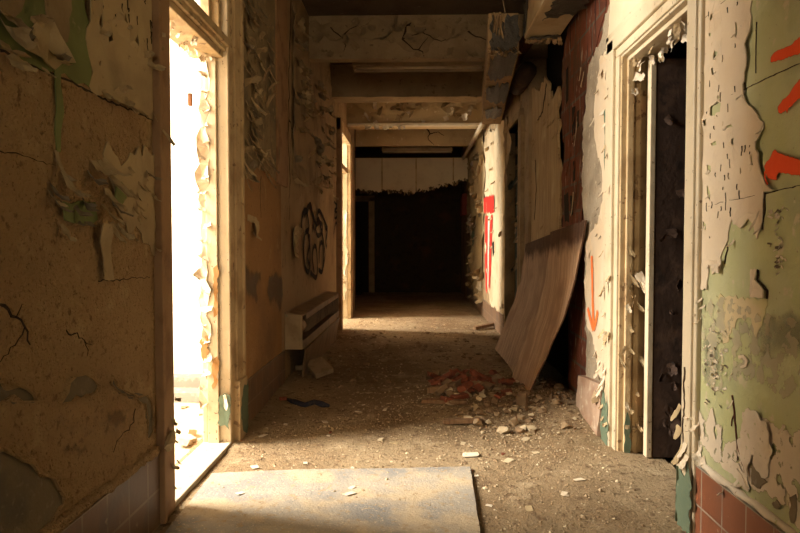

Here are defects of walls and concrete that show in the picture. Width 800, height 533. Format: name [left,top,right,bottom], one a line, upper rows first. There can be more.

crack [30,64,153,121]
peeling [243,0,282,191]
peeling [347,102,480,130]
crack [402,23,446,56]
crack [714,22,800,105]
peeling [0,0,231,429]
peeling [663,0,800,533]
crack [0,303,31,362]
peeling [241,382,249,433]